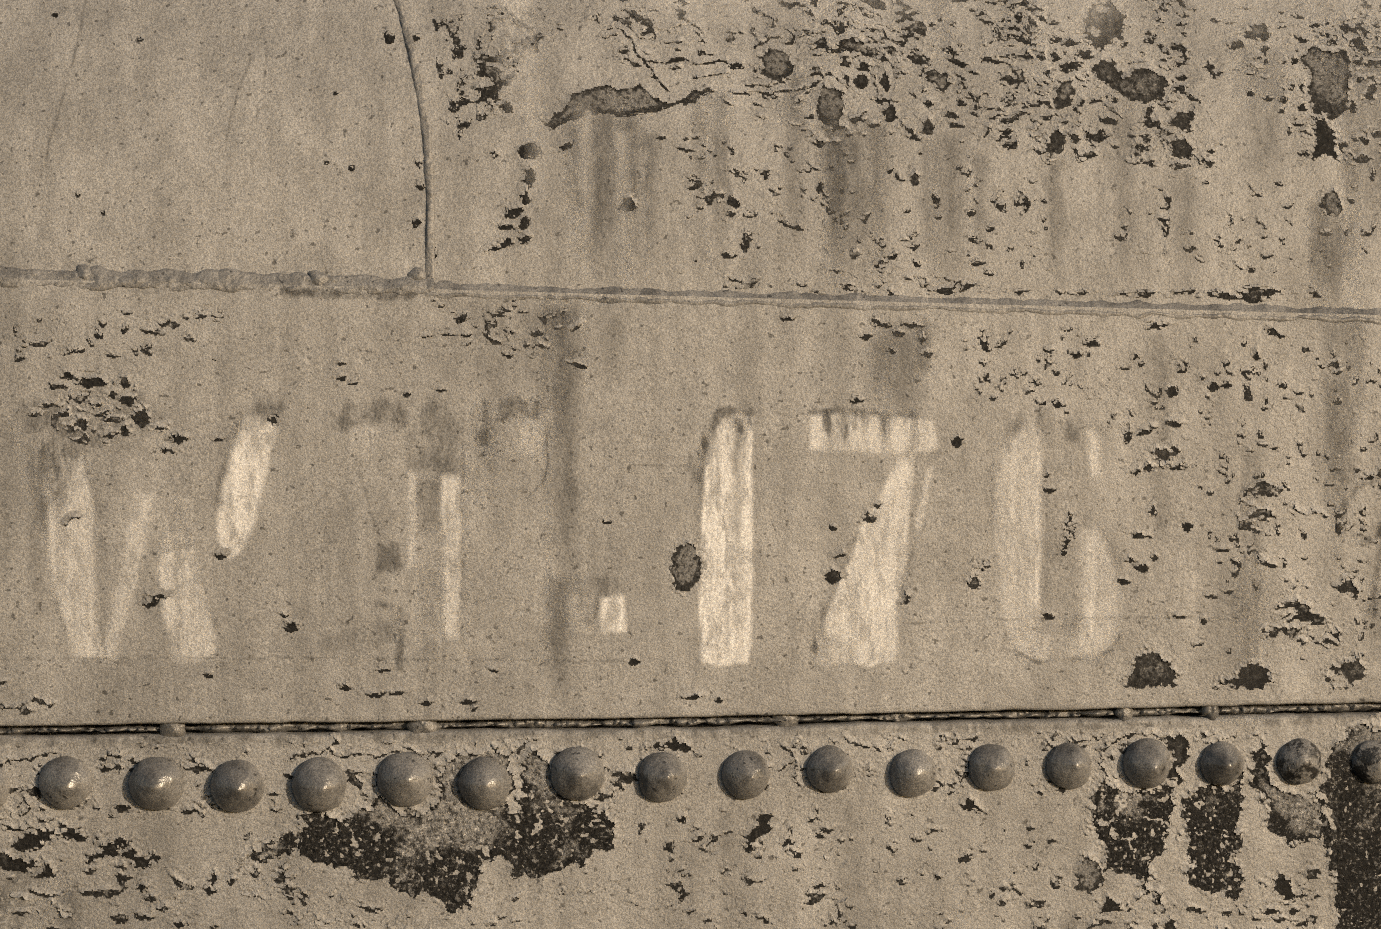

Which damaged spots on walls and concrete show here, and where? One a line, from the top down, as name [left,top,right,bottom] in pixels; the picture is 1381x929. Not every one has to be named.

peeling [383,0,1381,303]
peeling [415,297,592,369]
peeling [855,312,938,358]
spalling [13,301,228,454]
peeling [267,413,281,426]
peeling [946,431,967,448]
peeling [860,499,884,523]
peeling [213,546,231,560]
peeling [665,530,708,597]
peeling [820,521,851,585]
peeling [895,584,916,605]
peeling [0,712,1381,929]